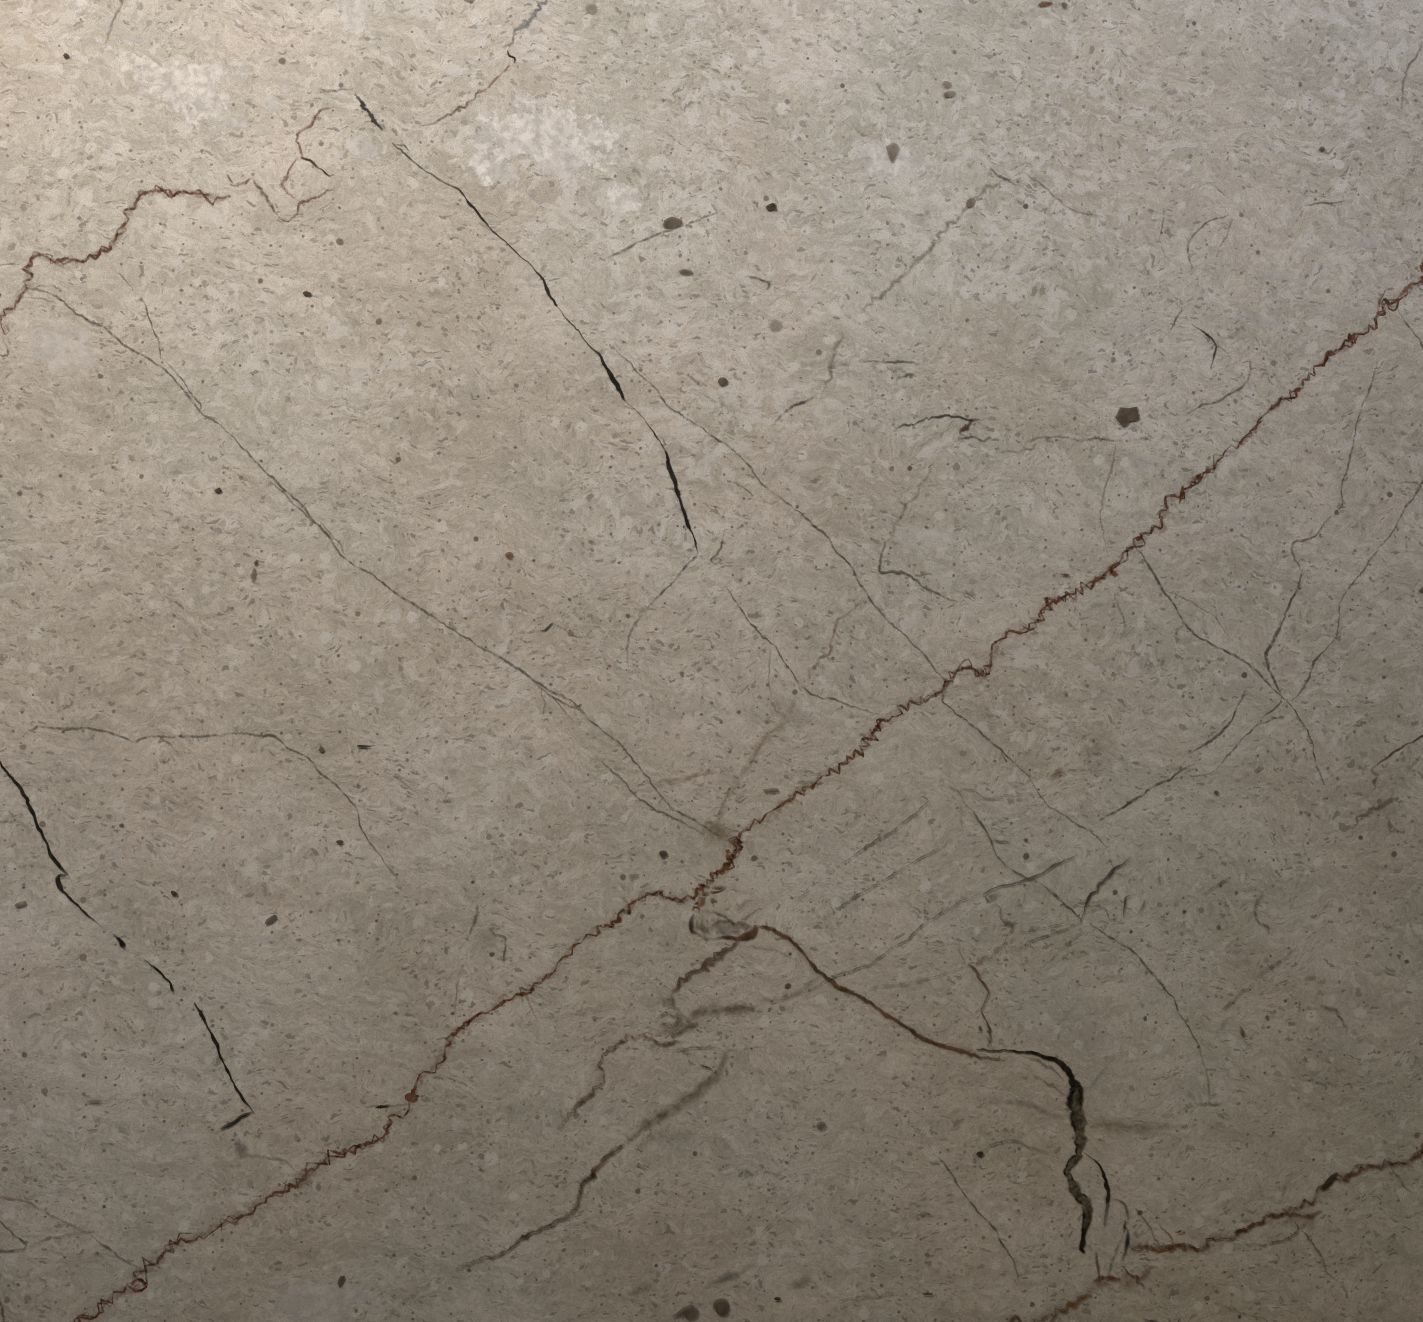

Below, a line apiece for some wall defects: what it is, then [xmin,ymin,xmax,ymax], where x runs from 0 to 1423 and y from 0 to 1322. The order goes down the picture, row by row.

crack [0,88,381,424]
crack [438,50,516,121]
crack [397,144,625,400]
crack [614,215,708,255]
crack [992,170,1074,210]
crack [33,261,1423,1322]
crack [0,761,254,1130]
crack [0,1196,74,1252]